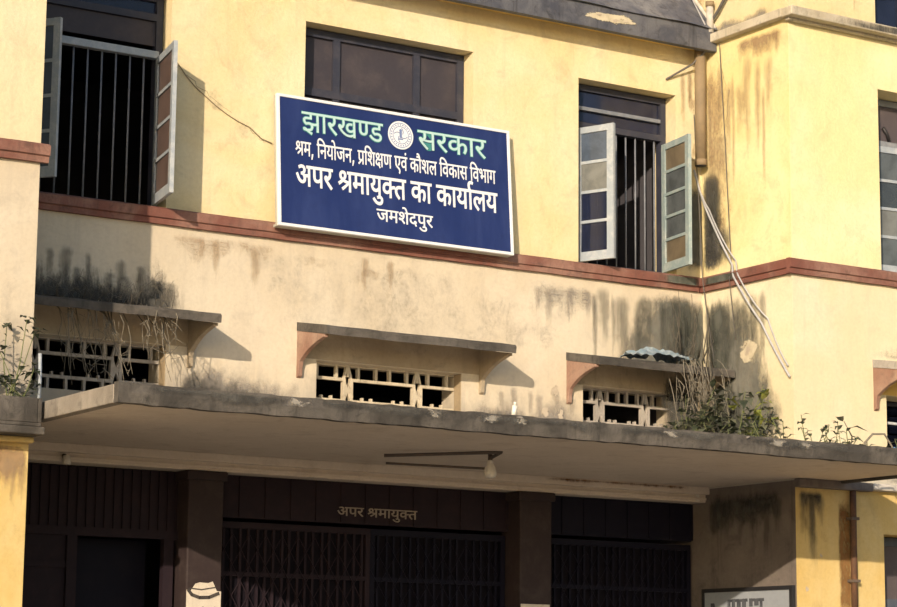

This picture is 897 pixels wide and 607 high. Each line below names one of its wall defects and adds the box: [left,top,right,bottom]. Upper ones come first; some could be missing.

peeling [585,12,636,25]
water stain [741,31,778,50]
water stain [691,84,729,269]
spalling [740,339,758,363]
water stain [622,299,847,451]
water stain [328,402,442,418]
water stain [480,409,587,430]
water stain [0,446,24,478]
water stain [801,493,821,504]
water stain [713,492,778,531]
corrosion [839,506,851,607]